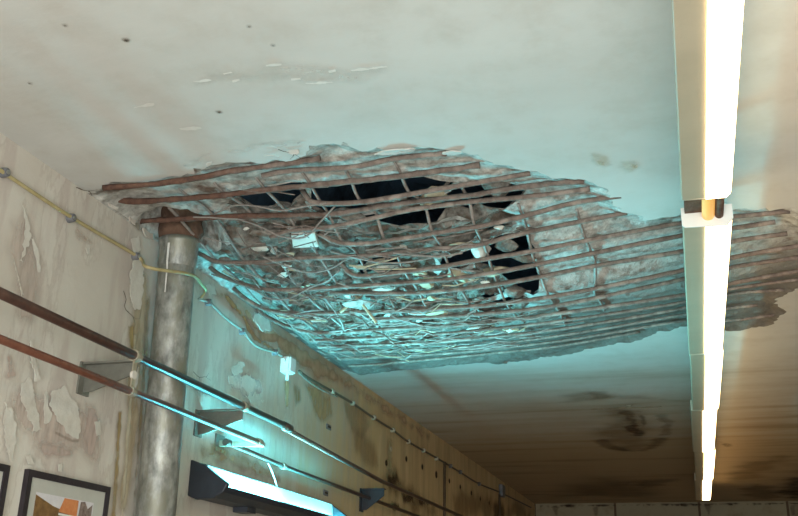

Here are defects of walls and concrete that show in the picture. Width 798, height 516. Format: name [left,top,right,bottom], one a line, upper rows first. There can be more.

peeling [14,204,41,302]
spalling [88,142,687,375]
spalling [724,208,798,331]
peeling [3,340,101,472]